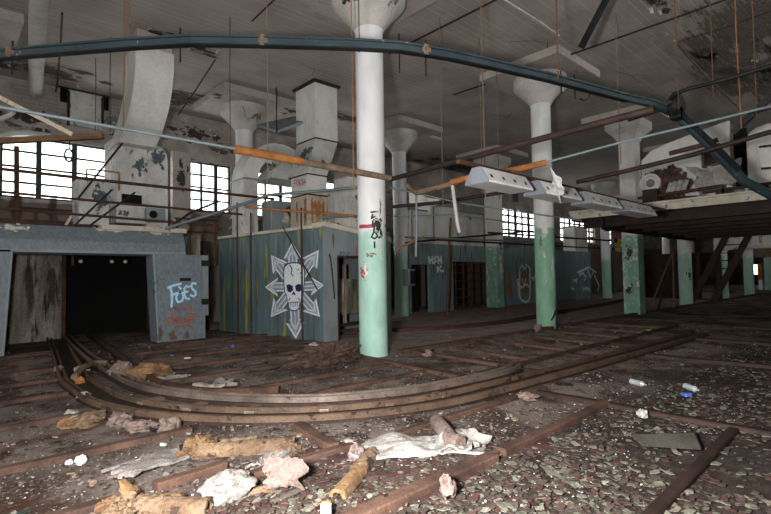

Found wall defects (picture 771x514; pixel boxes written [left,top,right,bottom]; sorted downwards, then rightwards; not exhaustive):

peeling [643,0,771,99]
peeling [0,104,72,133]
peeling [167,123,234,160]